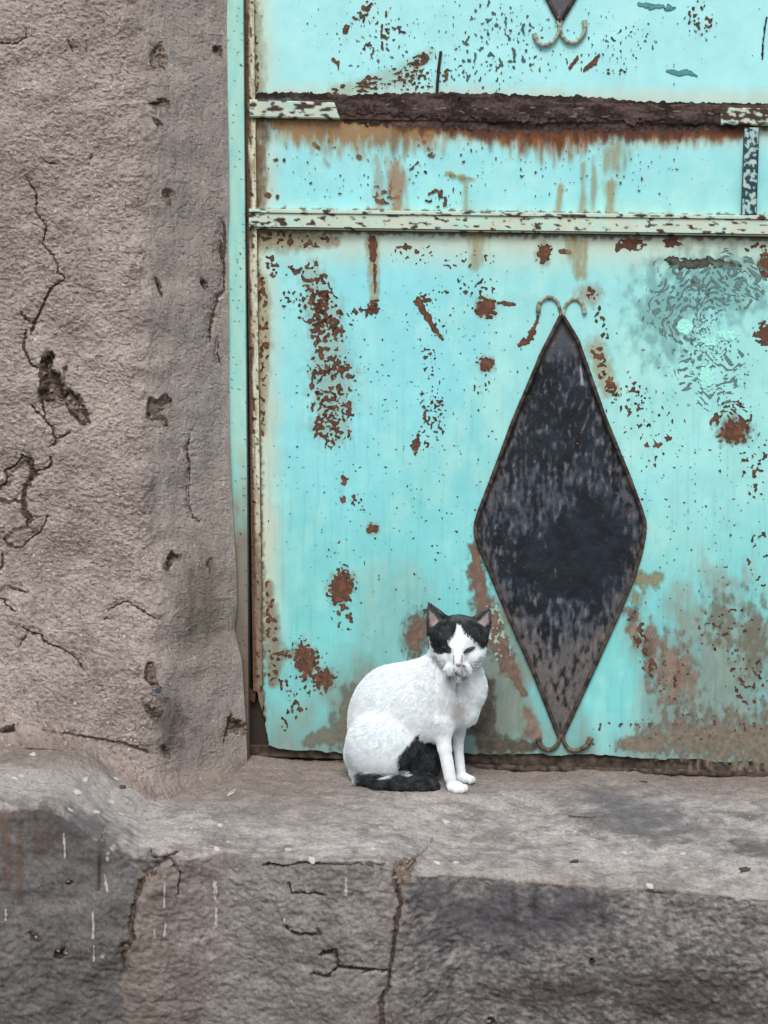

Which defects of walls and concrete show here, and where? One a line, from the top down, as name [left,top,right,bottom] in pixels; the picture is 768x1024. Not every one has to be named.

corrosion [254,0,768,213]
crack [20,161,65,368]
corrosion [247,230,411,539]
corrosion [535,236,768,590]
crack [0,394,84,670]
corrosion [265,581,340,731]
corrosion [313,539,376,635]
corrosion [449,495,548,696]
crack [121,847,181,968]
crack [266,861,403,1024]